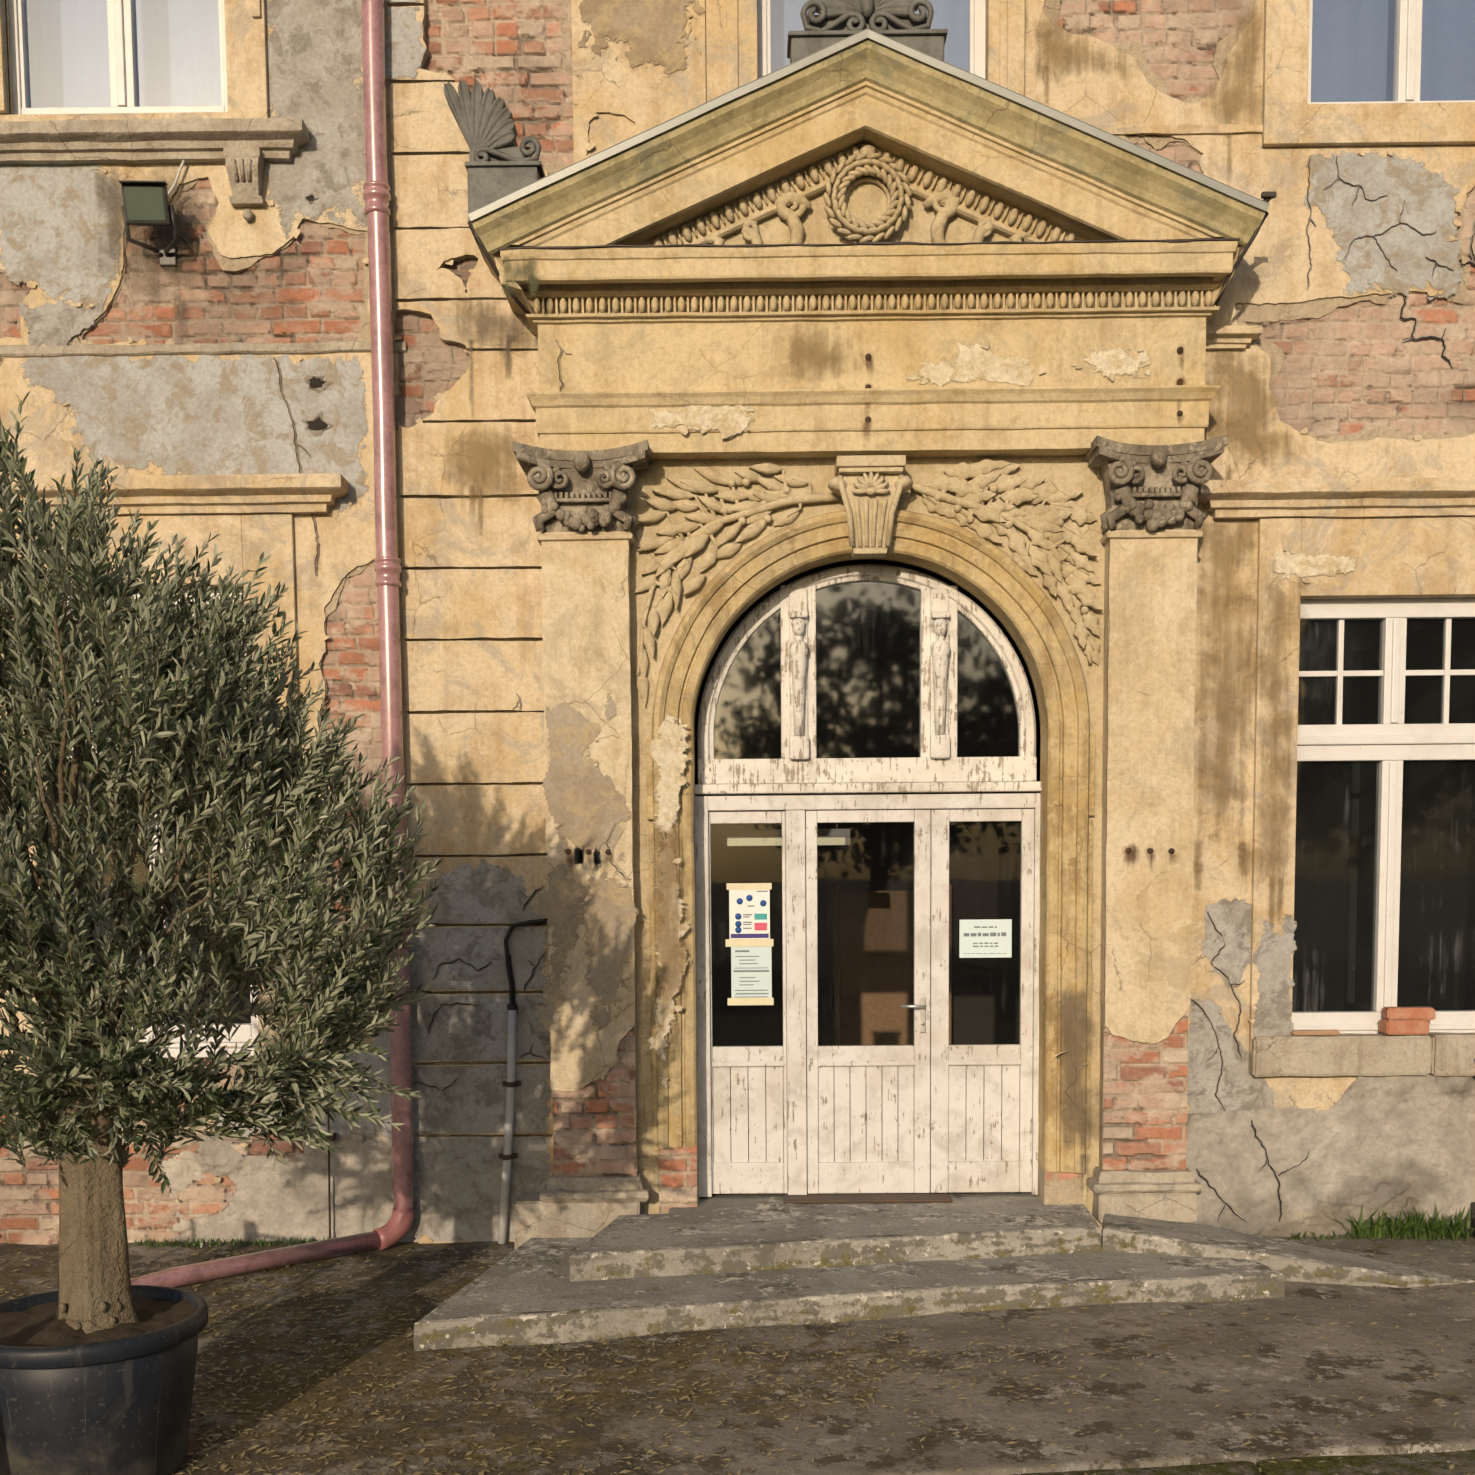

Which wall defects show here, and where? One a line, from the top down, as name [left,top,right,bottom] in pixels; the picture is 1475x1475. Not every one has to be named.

flaking render [384,0,706,174]
flaking render [1058,0,1253,101]
peeling [0,0,370,519]
flaking render [393,312,471,430]
flaking render [1243,148,1475,441]
crack [1306,156,1475,367]
flaking render [320,562,389,1011]
flaking render [0,1111,59,1245]
flaking render [122,1092,237,1243]
peeling [409,693,697,1242]
flaking render [1102,896,1297,1171]
crack [1190,912,1310,1222]